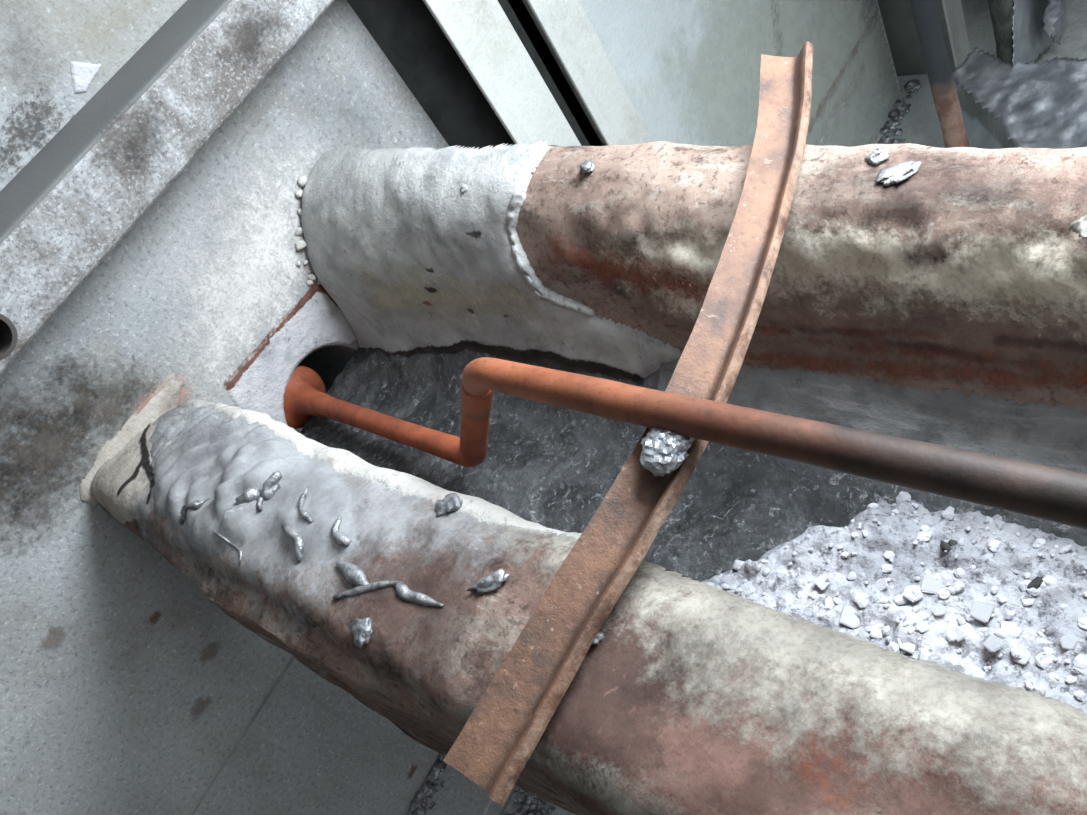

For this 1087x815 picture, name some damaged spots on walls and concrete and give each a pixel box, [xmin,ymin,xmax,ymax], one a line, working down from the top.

crack [117,423,155,504]